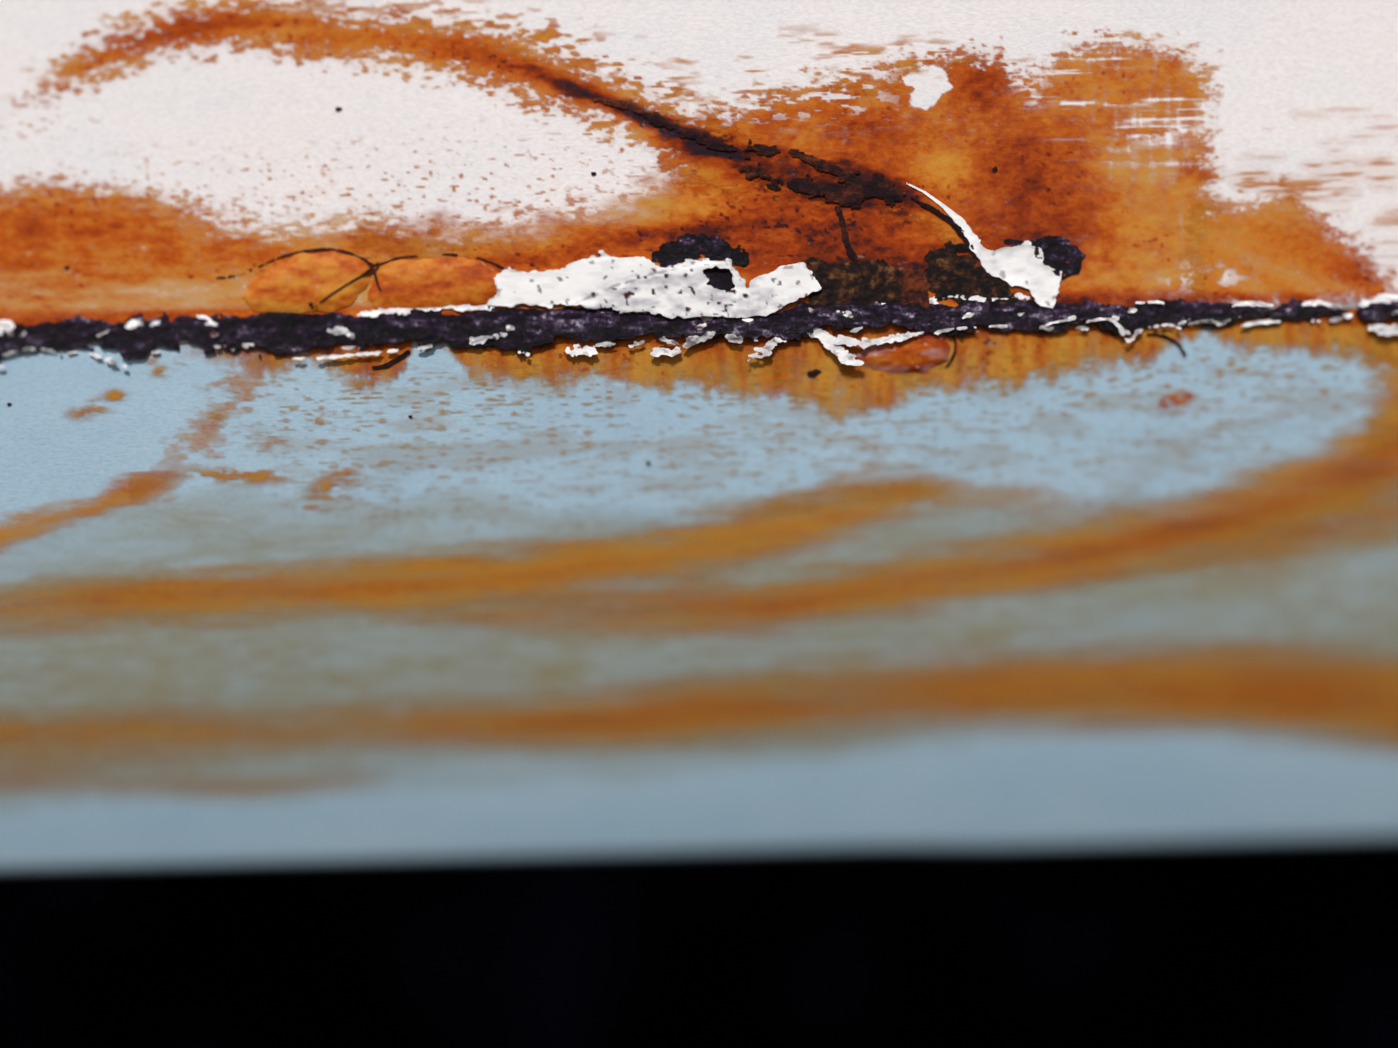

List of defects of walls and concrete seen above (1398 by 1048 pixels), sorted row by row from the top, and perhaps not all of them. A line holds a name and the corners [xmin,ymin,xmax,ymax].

crack [593,98,976,262]
rust [0,0,1398,630]
peeling [292,184,1281,366]
peeling [1301,293,1398,337]
rust [0,644,1398,754]